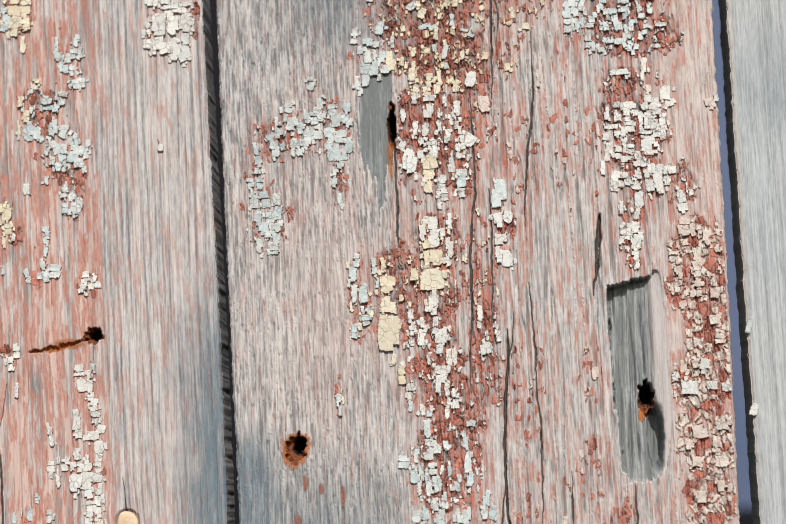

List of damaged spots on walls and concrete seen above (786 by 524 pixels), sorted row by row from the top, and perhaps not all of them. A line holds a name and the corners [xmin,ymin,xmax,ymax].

peeling [0,0,33,54]
peeling [141,0,200,67]
crack [489,0,499,100]
peeling [15,26,93,220]
peeling [0,194,23,250]
peeling [23,227,62,296]
spalling [240,0,737,524]
crack [468,88,544,524]
corrosion [38,339,82,353]
peeling [46,360,108,524]
corrosion [282,434,311,468]
crack [0,455,8,524]